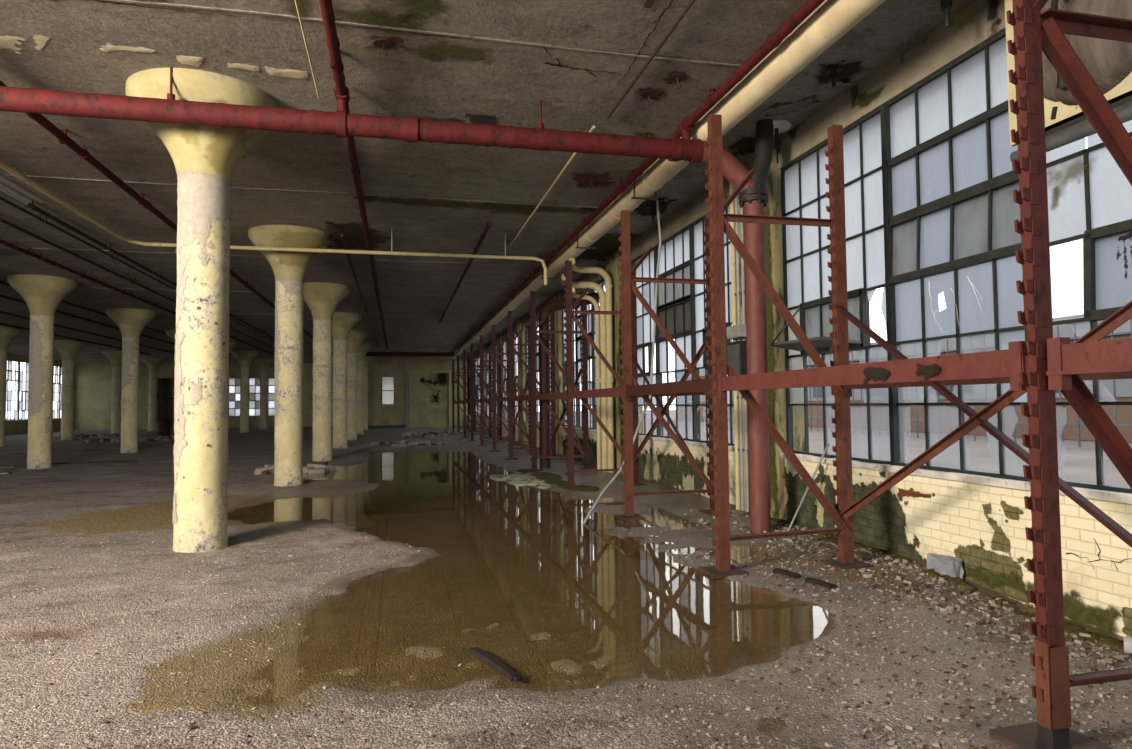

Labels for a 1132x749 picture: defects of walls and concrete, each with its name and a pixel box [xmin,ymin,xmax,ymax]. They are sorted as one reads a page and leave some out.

mould [334,0,486,61]
crack [352,25,475,40]
flaking render [0,35,52,54]
flaking render [99,43,155,53]
crack [544,0,731,101]
flaking render [176,55,203,67]
flaking render [227,63,308,80]
peeling [172,170,231,523]
crack [1066,539,1132,571]